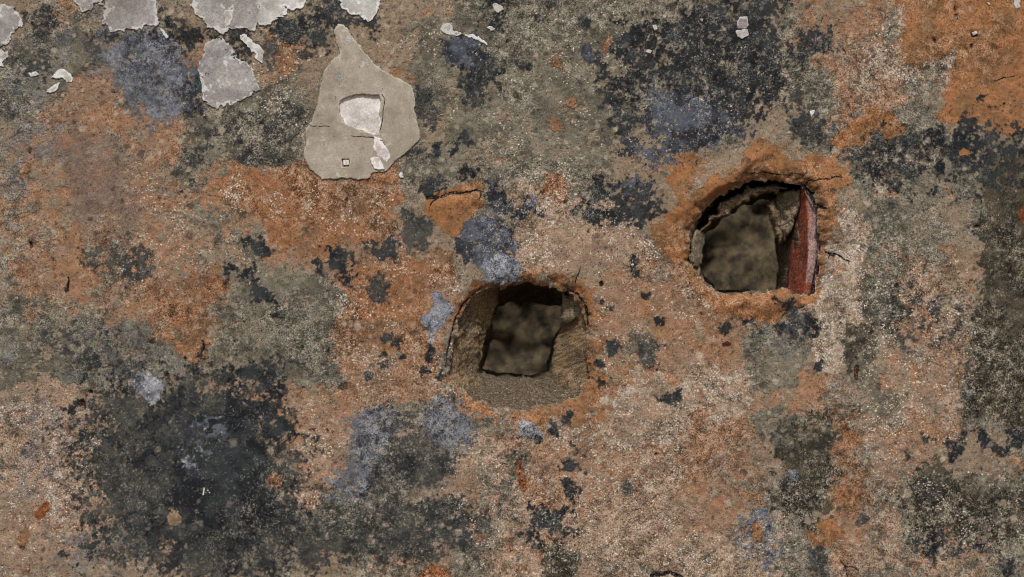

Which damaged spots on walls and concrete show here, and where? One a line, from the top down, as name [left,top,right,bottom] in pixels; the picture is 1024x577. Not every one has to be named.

peeling [0,4,24,67]
peeling [29,69,73,93]
peeling [74,0,169,39]
peeling [190,0,306,109]
peeling [339,0,380,22]
leakage [534,0,556,22]
leakage [560,0,1024,237]
peeling [211,94,485,361]
spalling [650,0,1024,376]
spalling [446,266,759,462]
leakage [25,308,495,577]
leakage [920,423,1024,463]